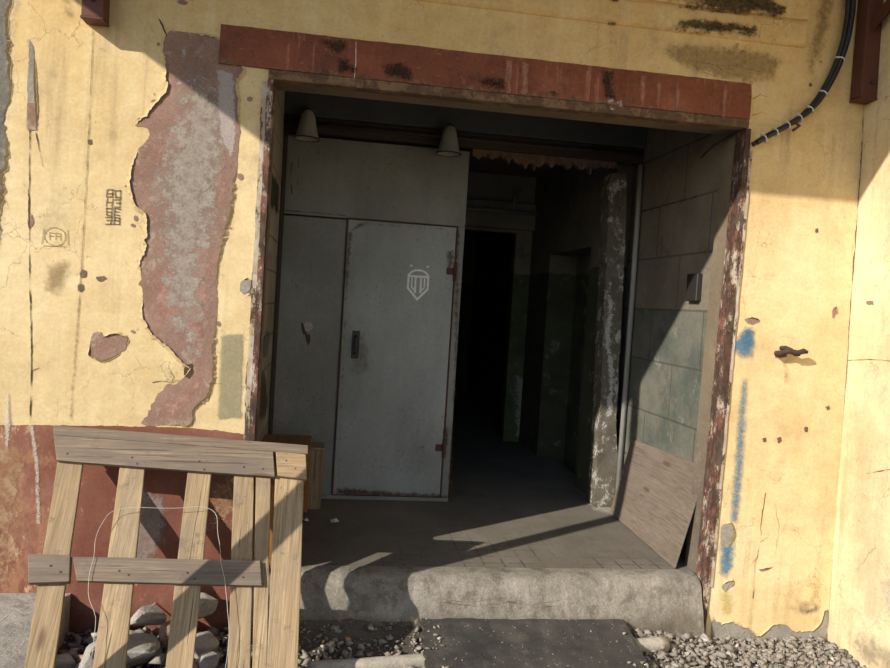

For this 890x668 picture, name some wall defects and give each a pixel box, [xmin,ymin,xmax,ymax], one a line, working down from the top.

damp [676,0,786,36]
peeling [0,127,10,213]
peeling [87,31,253,427]
damp [270,174,279,212]
crack [846,110,889,380]
peeling [605,297,616,416]
crack [750,493,780,598]
peeling [711,608,829,641]